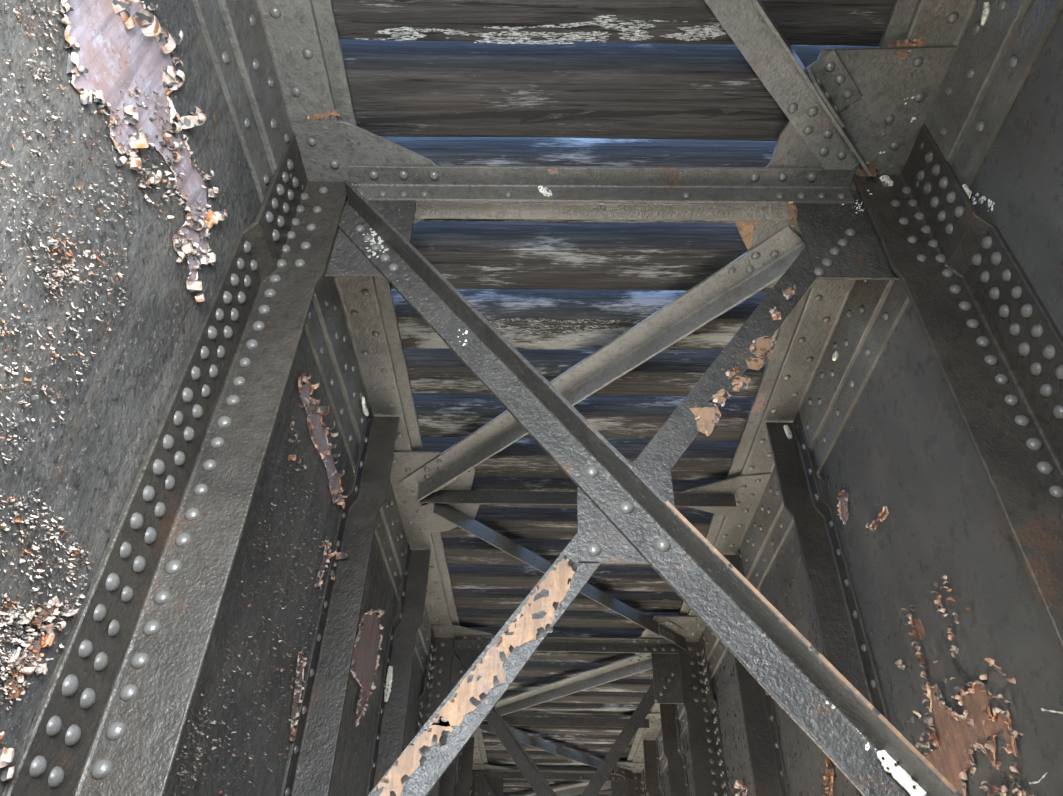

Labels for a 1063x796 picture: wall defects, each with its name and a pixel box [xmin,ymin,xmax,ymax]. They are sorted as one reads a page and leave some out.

peeling [0,0,227,465]
corrosion [689,336,776,436]
corrosion [781,285,796,300]
peeling [0,731,15,781]
peeling [0,488,95,714]
peeling [174,372,347,796]
peeling [350,608,385,726]
corrosion [369,555,578,796]
peeling [822,758,834,796]
peeling [901,575,1024,796]